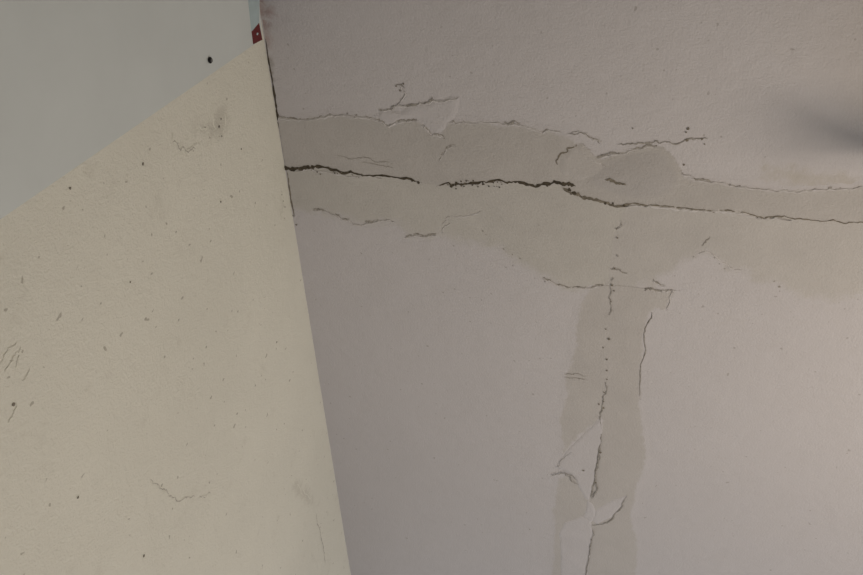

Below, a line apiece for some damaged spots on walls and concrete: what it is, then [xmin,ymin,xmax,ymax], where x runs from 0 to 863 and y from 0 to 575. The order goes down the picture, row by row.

crack [572,127,707,166]
peeling [277,86,863,575]
crack [284,165,863,498]